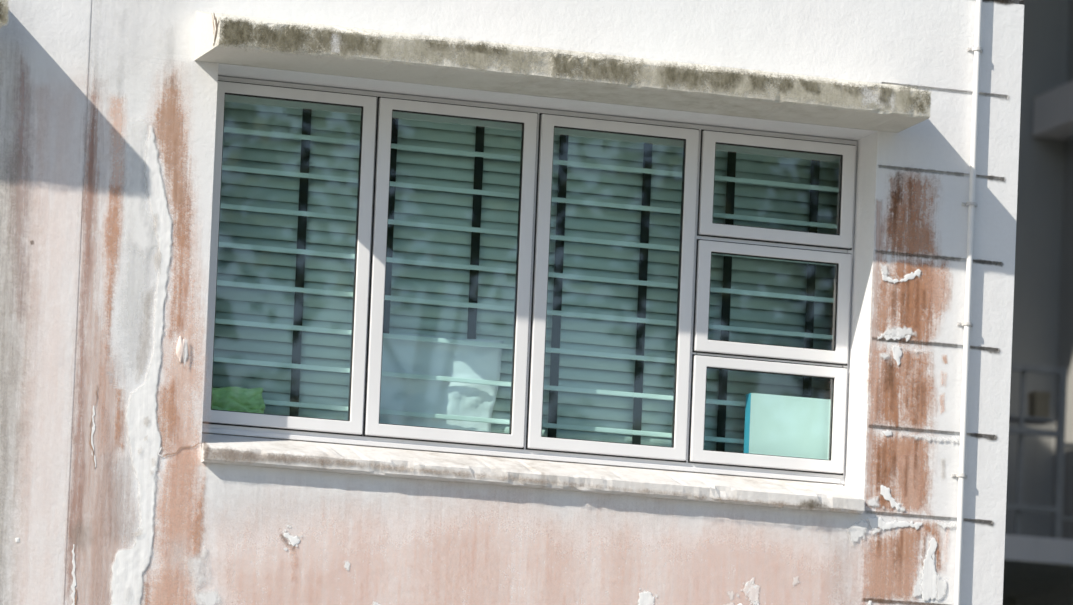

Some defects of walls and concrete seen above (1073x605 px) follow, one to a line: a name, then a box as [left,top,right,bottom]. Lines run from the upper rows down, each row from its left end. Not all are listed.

rust [105,168,121,317]
peeling [880,263,921,283]
peeling [111,122,172,605]
rust [145,79,202,605]
rust [866,175,945,511]
crack [158,443,199,457]
peeling [191,548,219,605]
spalling [283,524,302,551]
spalling [638,588,657,605]
peeling [848,485,922,545]
rust [869,524,939,598]
peeling [912,521,955,601]